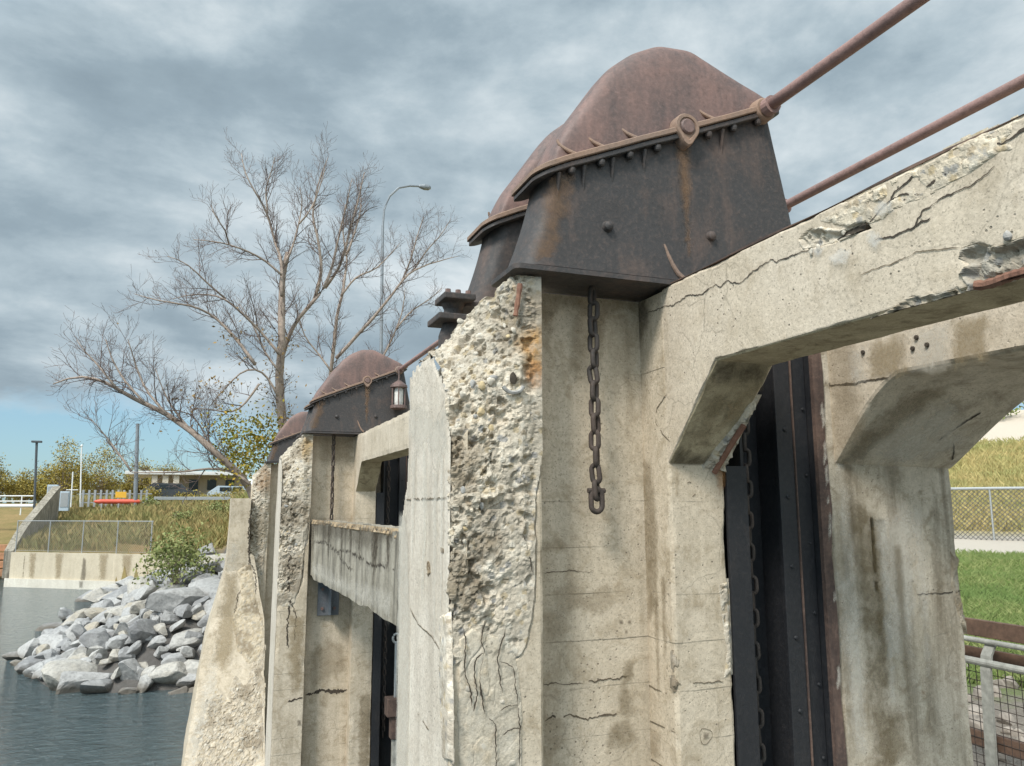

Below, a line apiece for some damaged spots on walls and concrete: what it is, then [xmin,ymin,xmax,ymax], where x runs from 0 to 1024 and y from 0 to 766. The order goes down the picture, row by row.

peeling [798,115,1024,256]
crack [861,127,1024,275]
crack [646,248,813,314]
spalling [870,230,1024,319]
spalling [701,394,761,477]
crack [286,552,297,648]
spalling [190,434,399,766]
crack [317,540,395,570]
spalling [419,275,543,766]
crack [288,689,347,702]
crack [463,624,627,766]